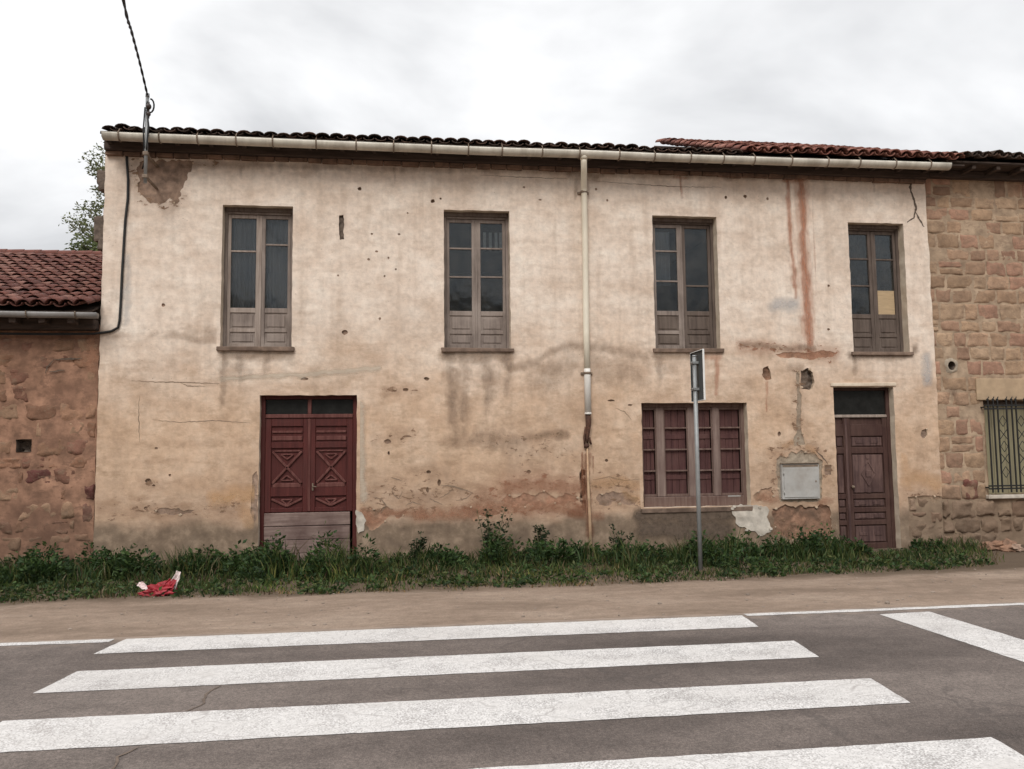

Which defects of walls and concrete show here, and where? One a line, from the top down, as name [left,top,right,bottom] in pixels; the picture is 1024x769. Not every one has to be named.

spalling [129,158,219,209]
crack [907,184,924,227]
corrosion [786,179,811,344]
spalling [361,432,639,530]
spalling [731,343,838,540]